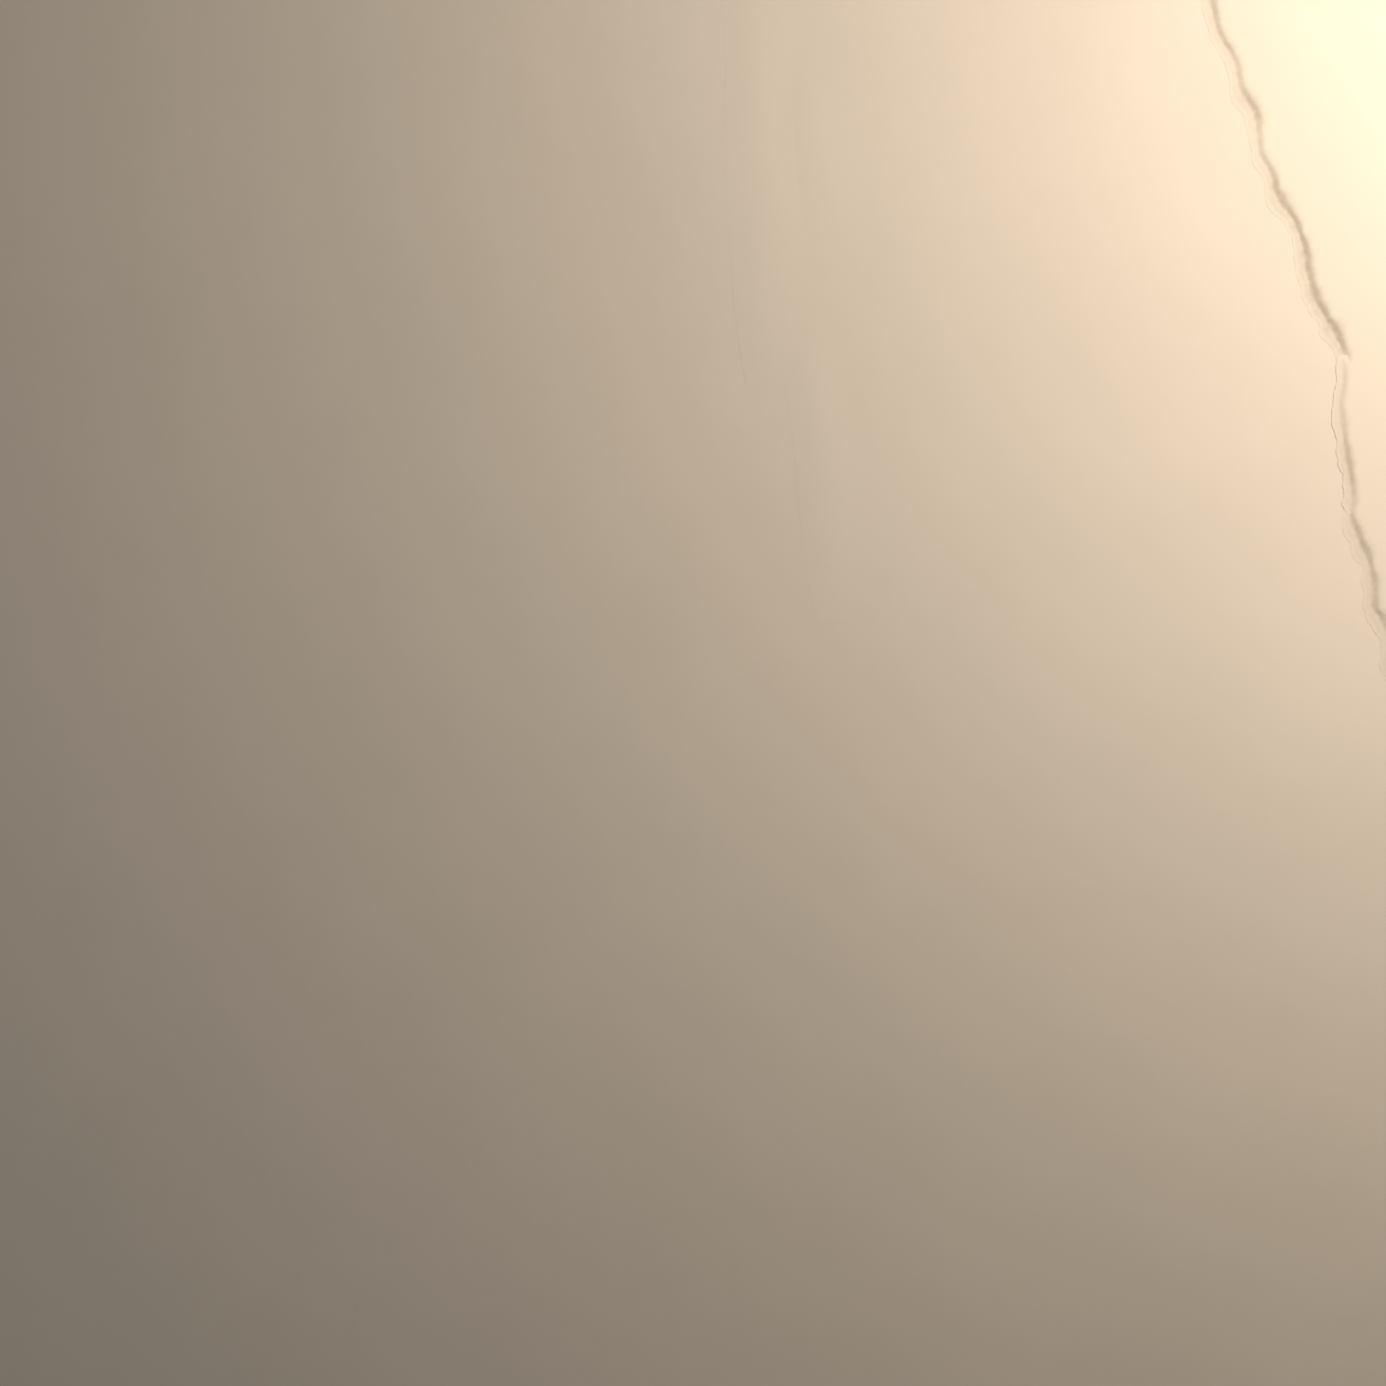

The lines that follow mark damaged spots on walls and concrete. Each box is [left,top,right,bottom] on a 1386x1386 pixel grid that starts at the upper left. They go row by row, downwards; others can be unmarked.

crack [1202,0,1386,676]